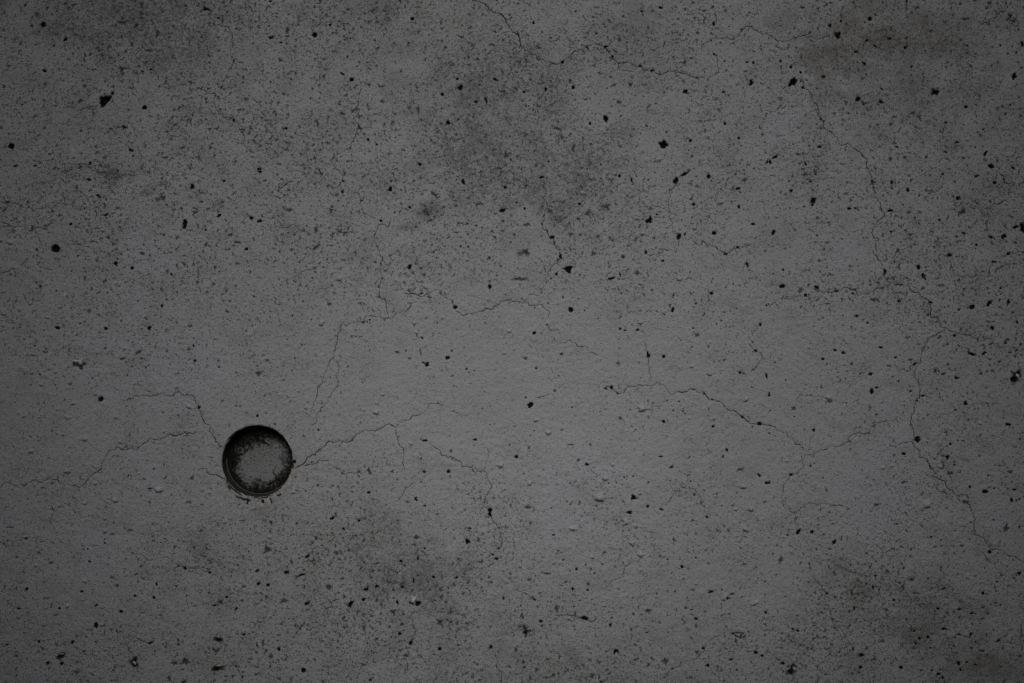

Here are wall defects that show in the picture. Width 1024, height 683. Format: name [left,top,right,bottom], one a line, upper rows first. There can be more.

crack [163,23,274,152]
crack [475,0,829,79]
crack [2,192,115,246]
crack [295,104,598,501]
crack [607,78,1022,639]
crack [0,390,222,488]
crack [430,443,502,548]